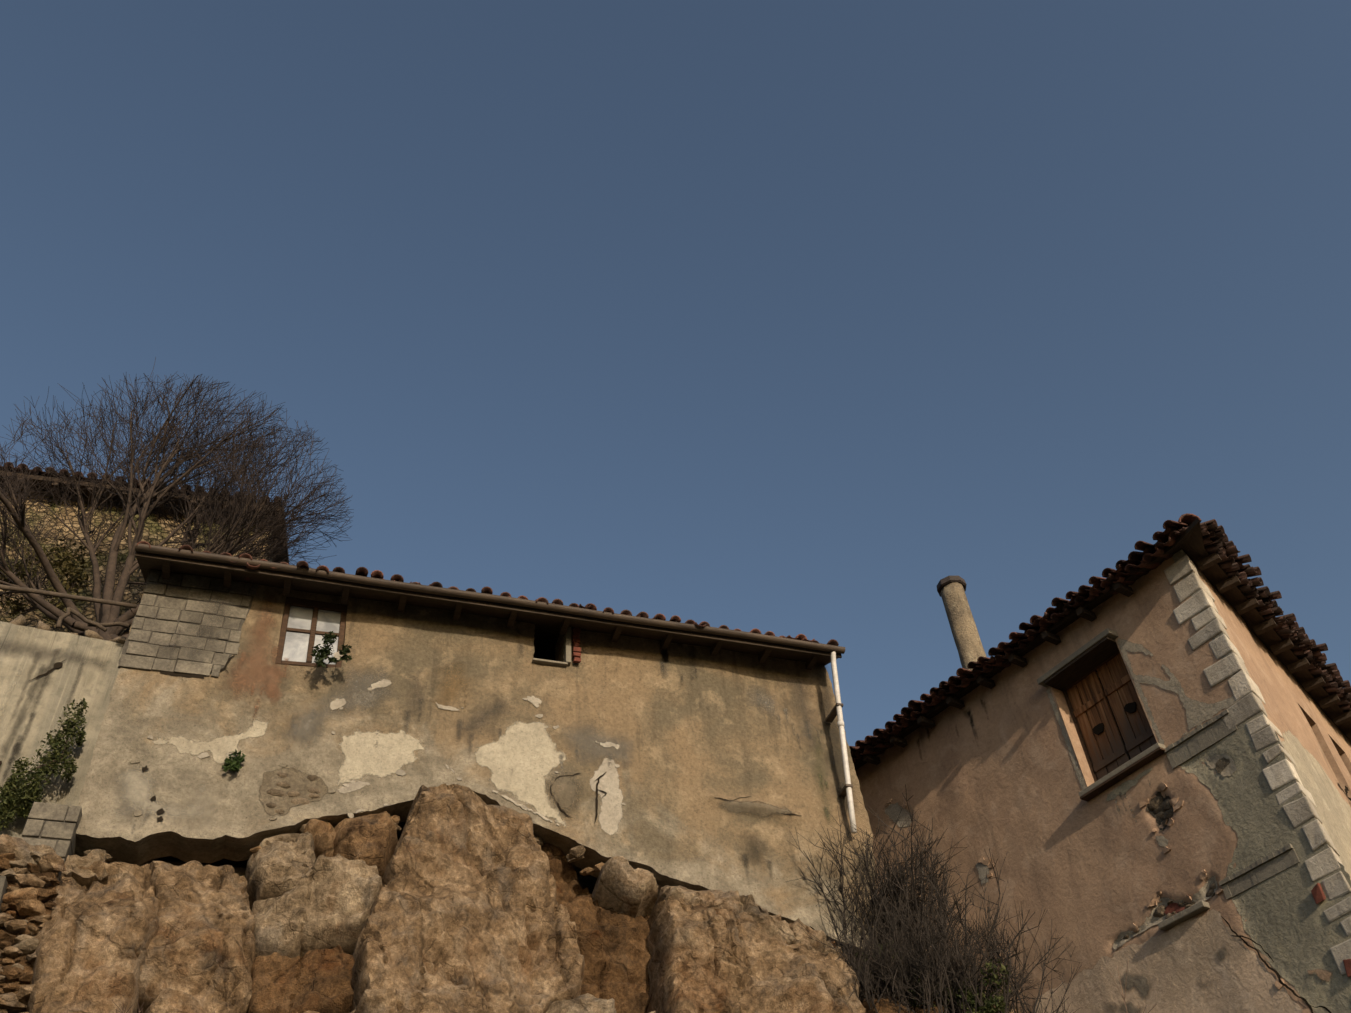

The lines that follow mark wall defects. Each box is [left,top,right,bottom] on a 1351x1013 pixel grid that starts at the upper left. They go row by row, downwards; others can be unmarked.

flaking render [367,679,391,691]
flaking render [259,730,425,821]
flaking render [475,696,566,827]
flaking render [590,740,626,835]
flaking render [1035,712,1351,1013]
crack [1221,916,1331,1013]